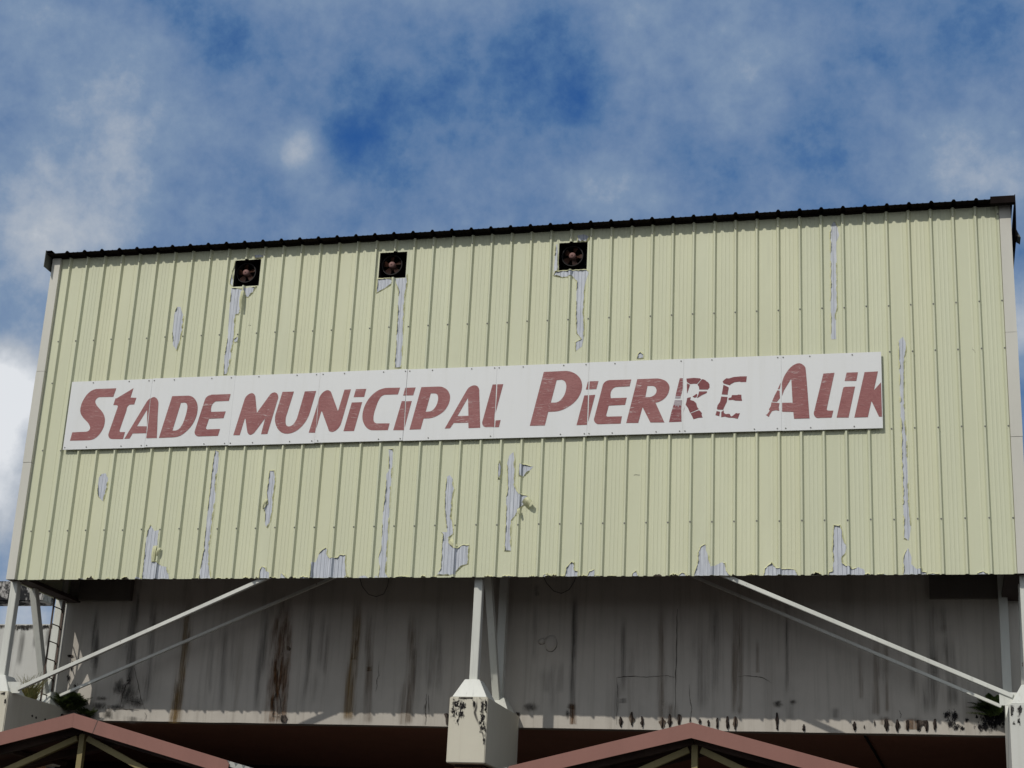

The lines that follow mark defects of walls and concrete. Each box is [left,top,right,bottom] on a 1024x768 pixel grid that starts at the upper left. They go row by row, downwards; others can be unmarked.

peeling [223,262,257,375]
peeling [376,274,408,369]
peeling [553,245,588,351]
peeling [78,524,169,579]
peeling [195,449,228,579]
peeling [243,448,470,578]
peeling [497,452,533,552]
peeling [654,544,798,576]
peeling [811,524,886,575]
peeling [898,337,939,575]
damp [90,681,140,717]
corrosion [269,619,289,721]